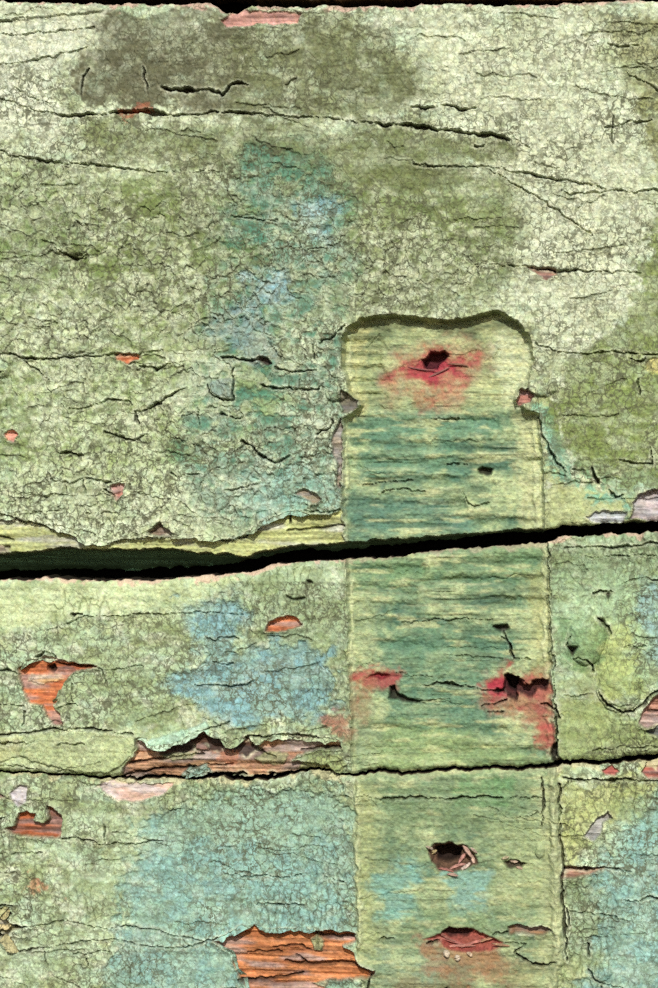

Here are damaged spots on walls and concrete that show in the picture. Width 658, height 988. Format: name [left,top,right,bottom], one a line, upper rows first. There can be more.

peeling [221,9,302,28]
crack [0,15,658,234]
crack [460,263,641,274]
crack [0,324,348,491]
crack [535,342,658,396]
crack [537,416,653,498]
crack [0,451,172,546]
peeling [0,488,350,571]
peeling [586,488,658,524]
peeling [0,655,342,803]
peeling [0,784,63,839]
peeling [213,924,374,988]